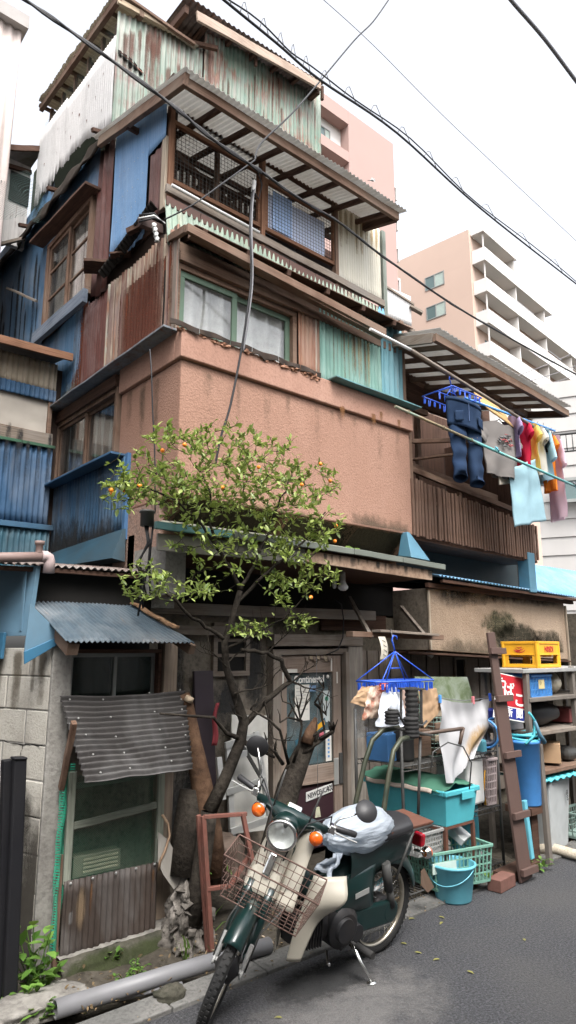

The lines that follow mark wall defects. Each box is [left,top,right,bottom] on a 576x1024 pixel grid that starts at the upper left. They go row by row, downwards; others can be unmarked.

corrosion [123,30,180,86]
corrosion [107,244,172,354]
spalling [170,317,321,381]
corrosion [333,319,369,367]
leakage [441,587,563,653]